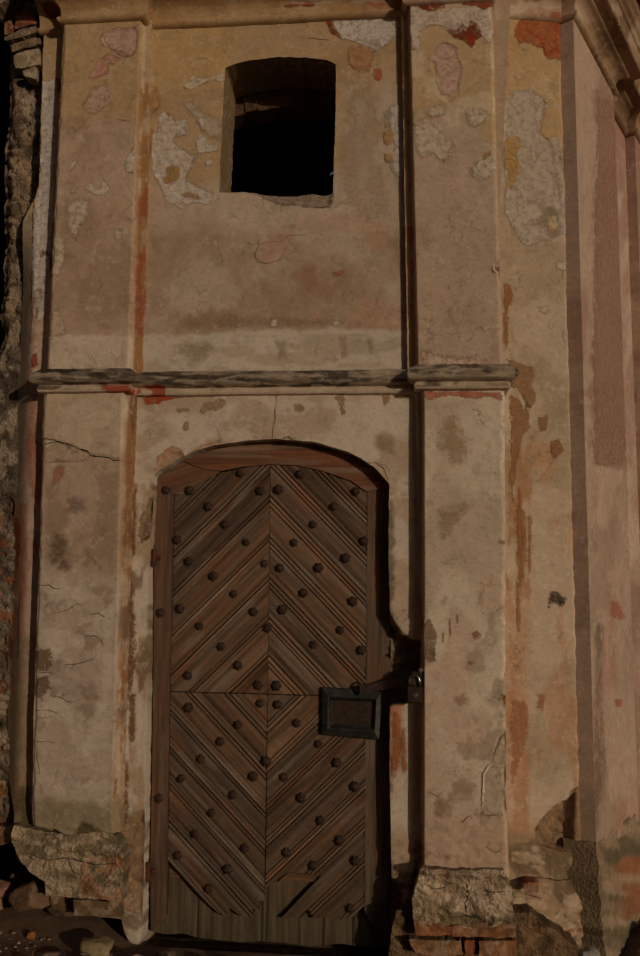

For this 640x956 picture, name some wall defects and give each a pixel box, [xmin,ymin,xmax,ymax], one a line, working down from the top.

peeling [327,2,494,81]
peeling [150,72,225,209]
peeling [383,103,454,178]
peeling [466,89,566,246]
peeling [420,284,548,500]
flaking render [0,0,109,880]
crack [42,438,119,461]
spalling [390,612,437,706]
spalling [535,786,581,854]